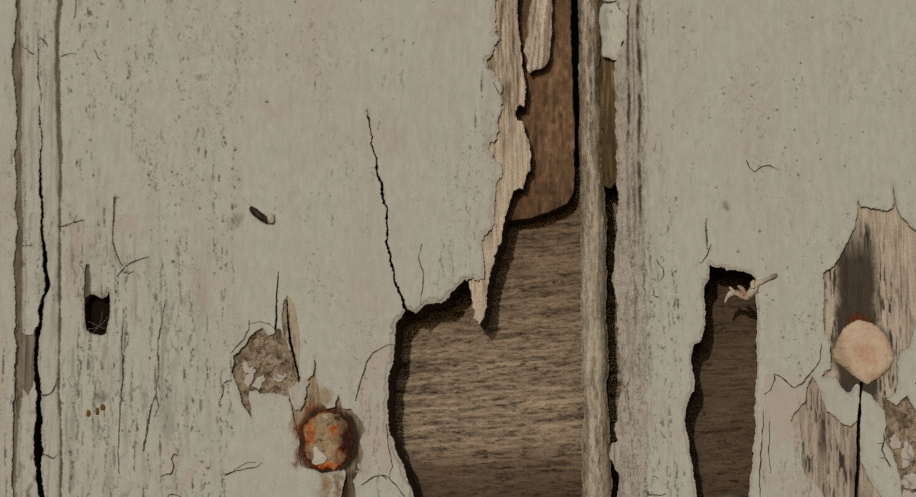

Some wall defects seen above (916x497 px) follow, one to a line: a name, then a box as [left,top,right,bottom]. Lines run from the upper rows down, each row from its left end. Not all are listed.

crack [22,37,102,198]
crack [367,110,424,315]
crack [21,245,58,497]
peeling [232,296,404,497]
peeling [760,190,916,497]
crack [854,381,891,497]